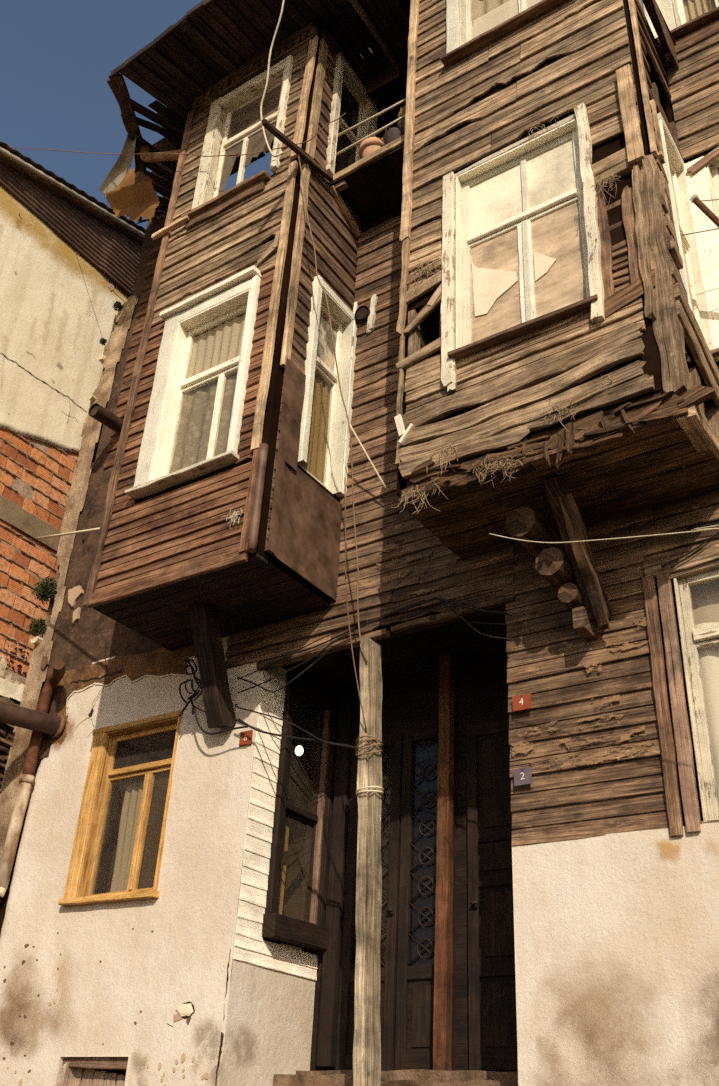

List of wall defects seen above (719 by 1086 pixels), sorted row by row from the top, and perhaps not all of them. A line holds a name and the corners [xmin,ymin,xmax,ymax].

flaking render [68,585,84,624]
peeling [511,695,654,769]